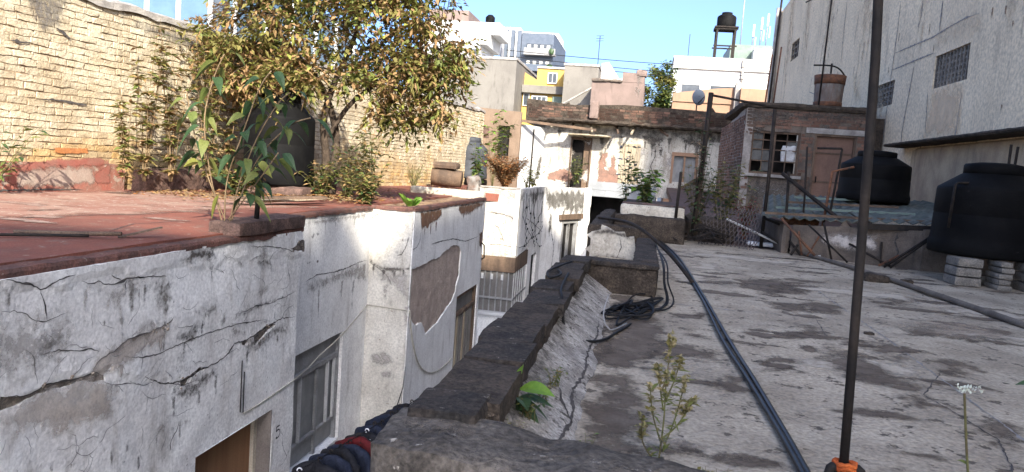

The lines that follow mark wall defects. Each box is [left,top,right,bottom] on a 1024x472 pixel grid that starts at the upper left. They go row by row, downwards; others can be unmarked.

peeling [548,137,623,183]
spalling [421,209,442,235]
crack [0,192,554,471]
peeling [410,245,460,333]
crack [559,322,599,439]